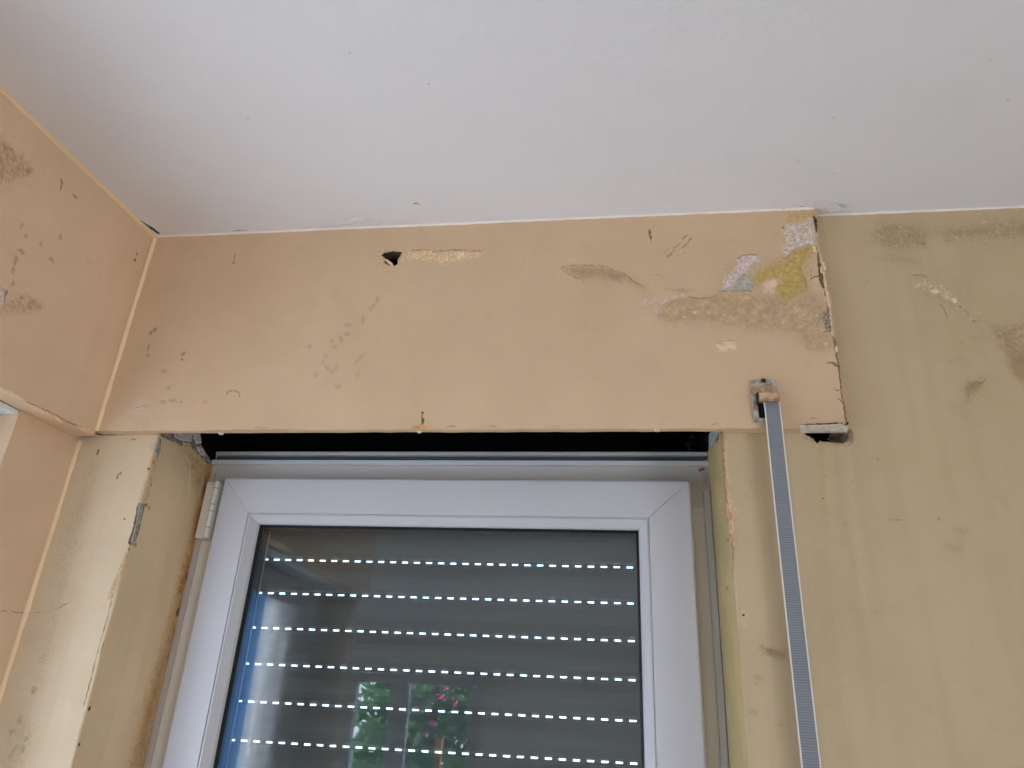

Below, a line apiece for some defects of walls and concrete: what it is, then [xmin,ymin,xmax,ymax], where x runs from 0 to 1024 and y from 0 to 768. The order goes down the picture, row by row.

peeling [382,248,488,266]
peeling [718,253,761,292]
peeling [781,209,819,257]
crack [811,215,847,423]
spalling [84,427,285,704]